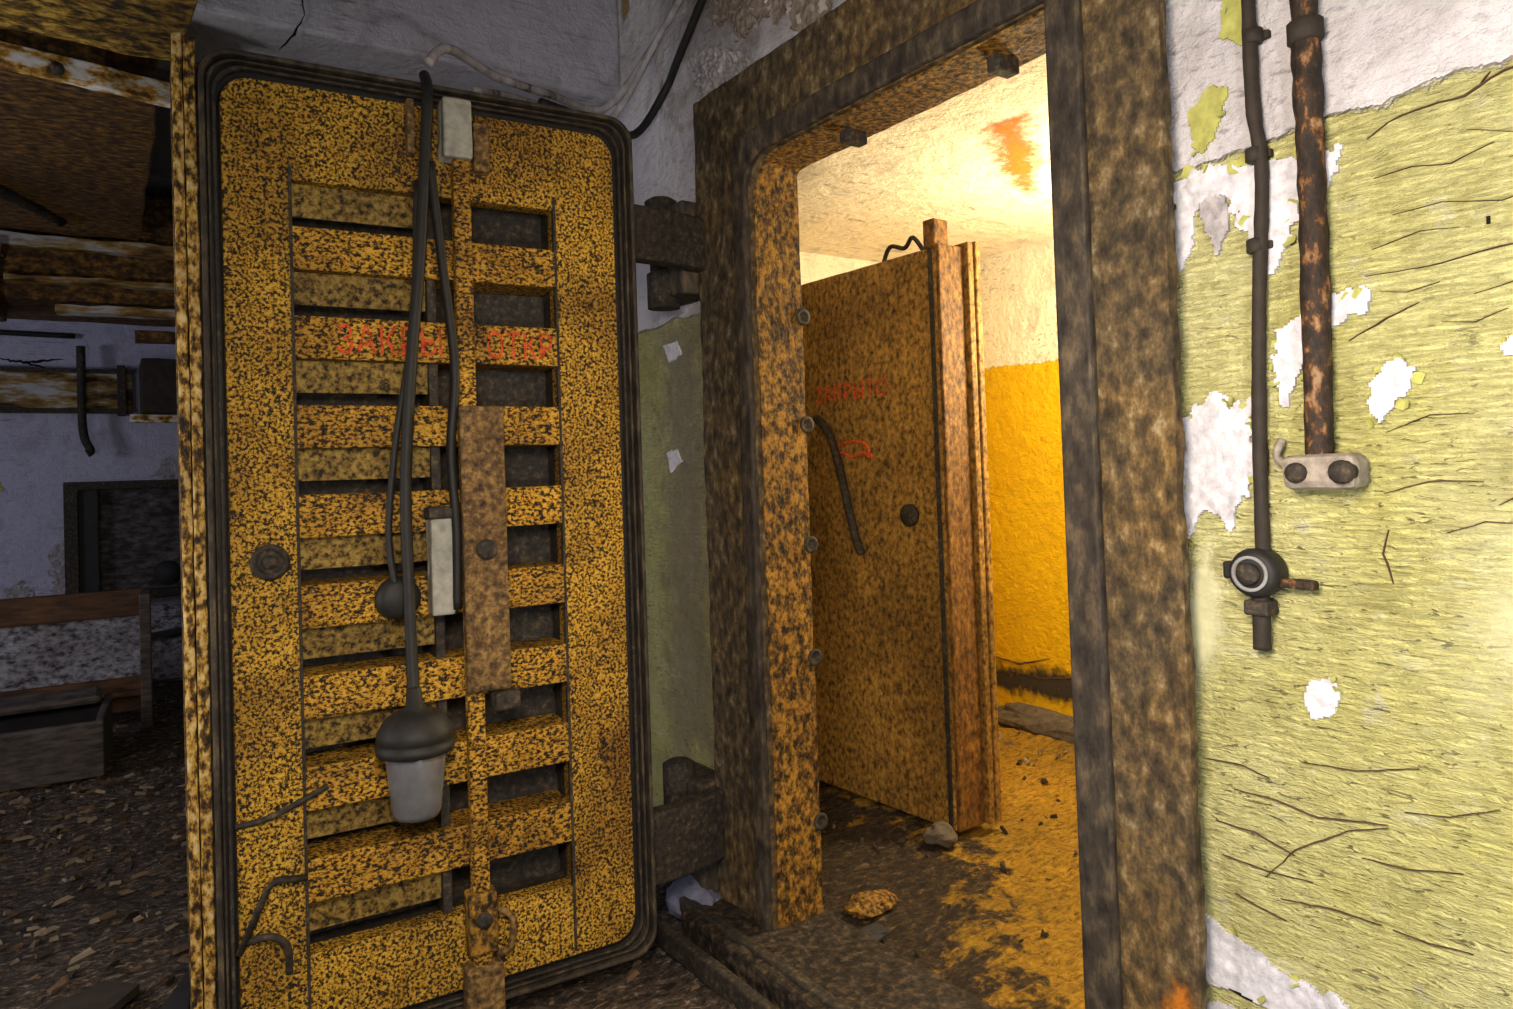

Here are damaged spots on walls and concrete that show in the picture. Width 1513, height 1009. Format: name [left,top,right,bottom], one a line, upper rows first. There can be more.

peeling [1173,85,1299,275]
crack [1349,66,1513,341]
peeling [1331,285,1372,329]
peeling [1183,391,1253,547]
peeling [1269,309,1303,407]
peeling [1365,353,1426,428]
crack [1385,413,1475,433]
crack [1383,480,1513,533]
crack [1382,530,1394,584]
crack [1207,758,1500,955]
crack [1230,989,1256,1009]
peeling [1205,908,1350,1009]